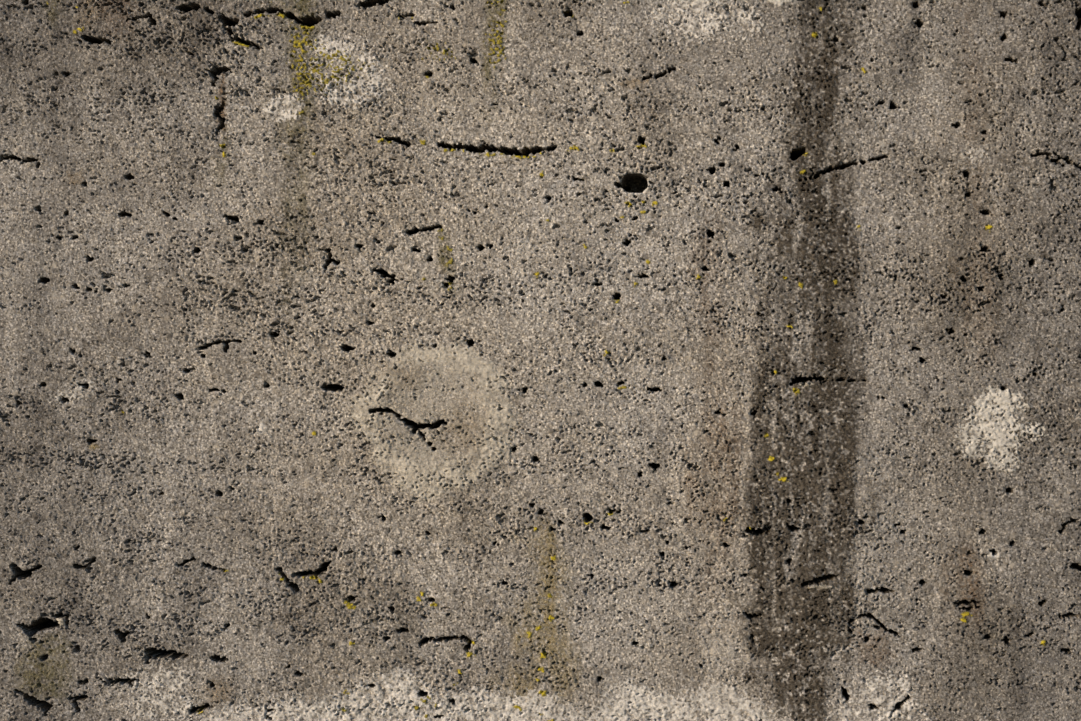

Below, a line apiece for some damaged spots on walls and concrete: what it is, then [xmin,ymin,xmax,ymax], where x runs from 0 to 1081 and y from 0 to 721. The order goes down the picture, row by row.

crack [375,135,411,148]
crack [437,142,557,156]
water stain [123,0,937,721]
crack [368,407,448,451]